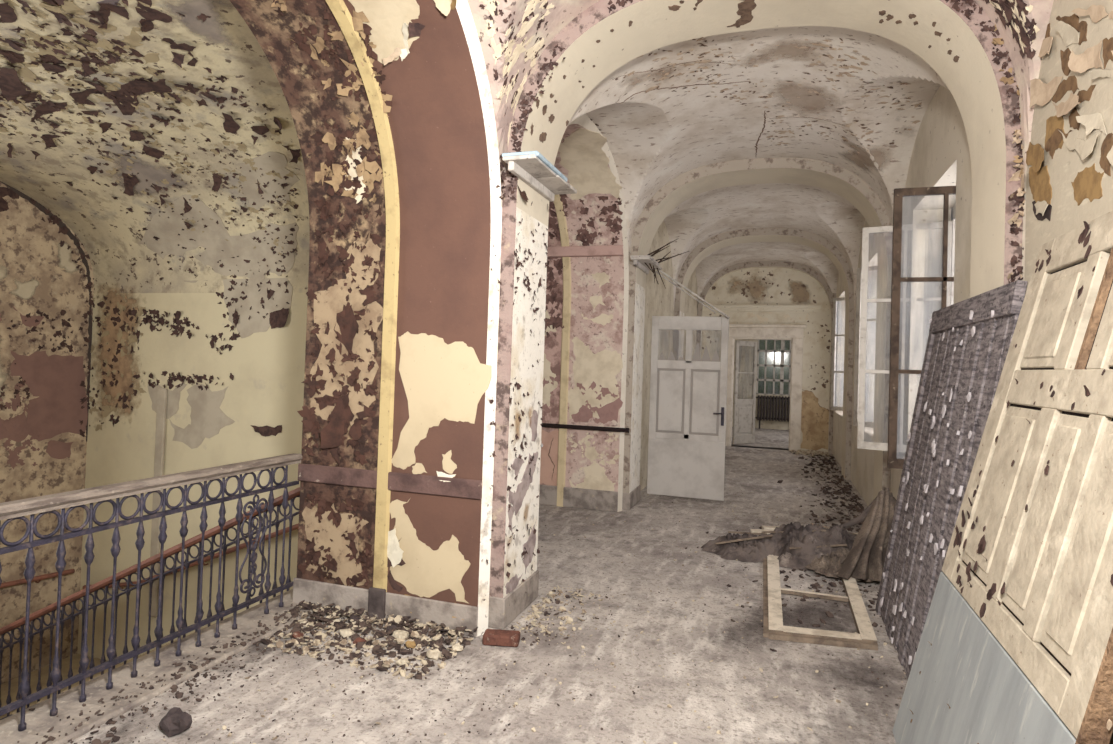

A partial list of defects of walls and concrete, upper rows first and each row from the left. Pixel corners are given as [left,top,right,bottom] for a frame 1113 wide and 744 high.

flaking render [0,0,425,469]
flaking render [391,331,494,482]
flaking render [479,0,623,605]
peeling [607,0,633,13]
peeling [945,0,1113,283]